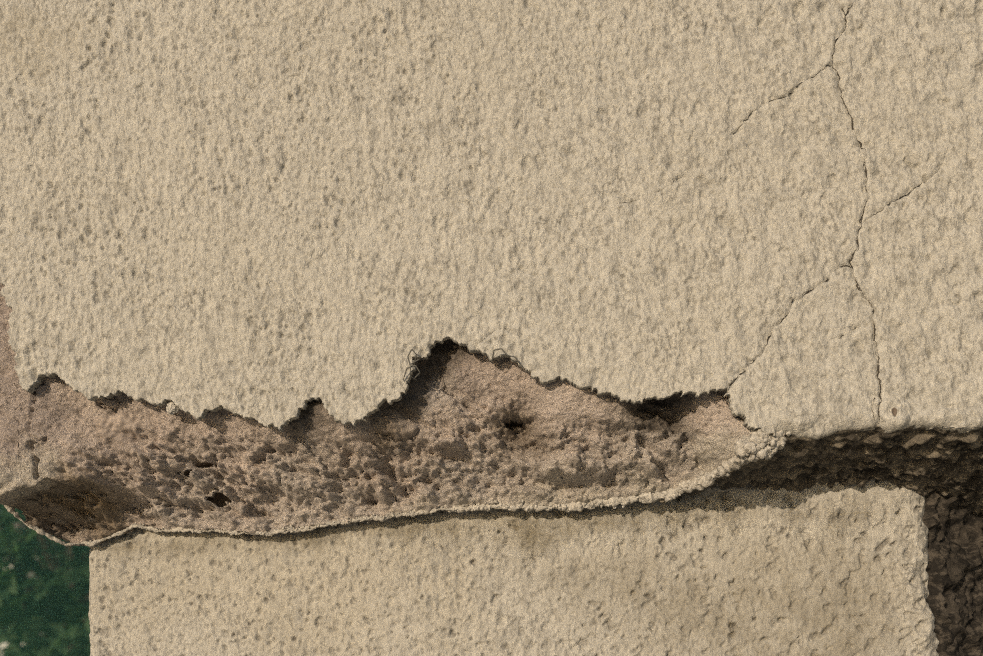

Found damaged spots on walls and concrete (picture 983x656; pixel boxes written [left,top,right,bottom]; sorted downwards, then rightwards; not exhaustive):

spalling [0,283,791,547]
crack [729,4,940,437]